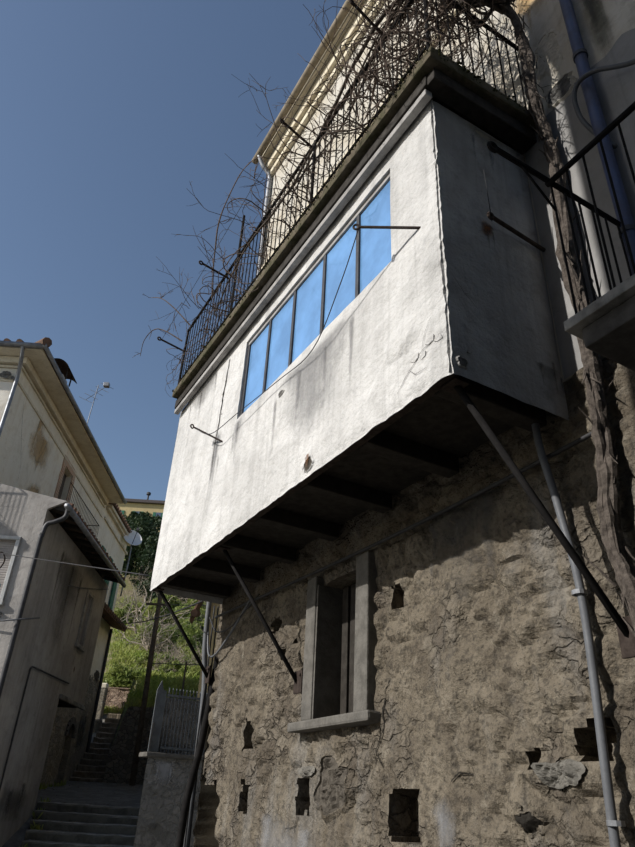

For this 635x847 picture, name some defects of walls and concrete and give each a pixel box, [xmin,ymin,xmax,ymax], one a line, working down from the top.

leakage [582,0,607,42]
crack [399,322,443,390]
leakage [34,421,47,464]
spalling [298,750,356,823]
spalling [513,804,550,847]